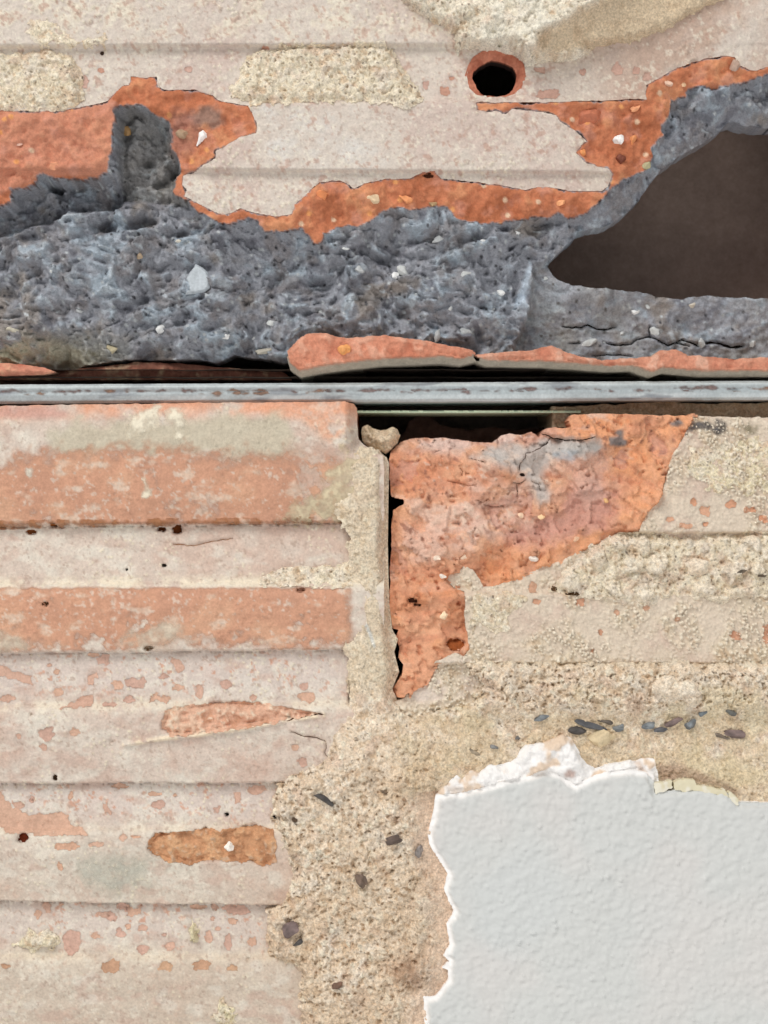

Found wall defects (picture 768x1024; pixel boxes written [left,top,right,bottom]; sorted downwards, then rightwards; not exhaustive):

spalling [0,50,768,385]
crack [562,324,742,357]
peeling [666,498,710,529]
peeling [725,499,768,523]
spalling [389,413,698,698]
peeling [0,587,351,737]
peeling [38,726,55,751]
spalling [437,719,739,806]
peeling [0,792,104,871]
spalling [119,785,277,866]